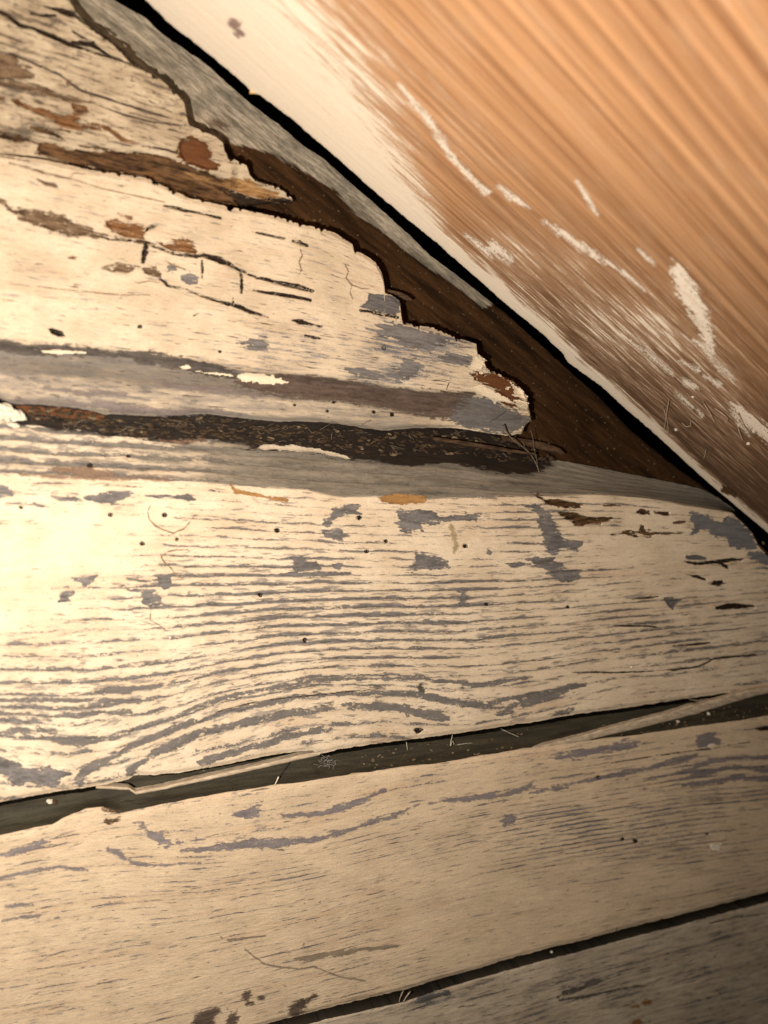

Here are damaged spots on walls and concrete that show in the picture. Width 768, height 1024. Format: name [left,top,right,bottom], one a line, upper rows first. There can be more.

peeling [104,263,199,285]
peeling [236,335,269,352]
peeling [343,293,531,437]
peeling [258,444,350,459]
peeling [322,504,362,541]
peeling [380,493,482,534]
peeling [505,504,583,583]
peeling [689,511,768,570]
peeling [279,556,351,577]
peeling [409,550,451,573]
peeling [663,597,682,610]